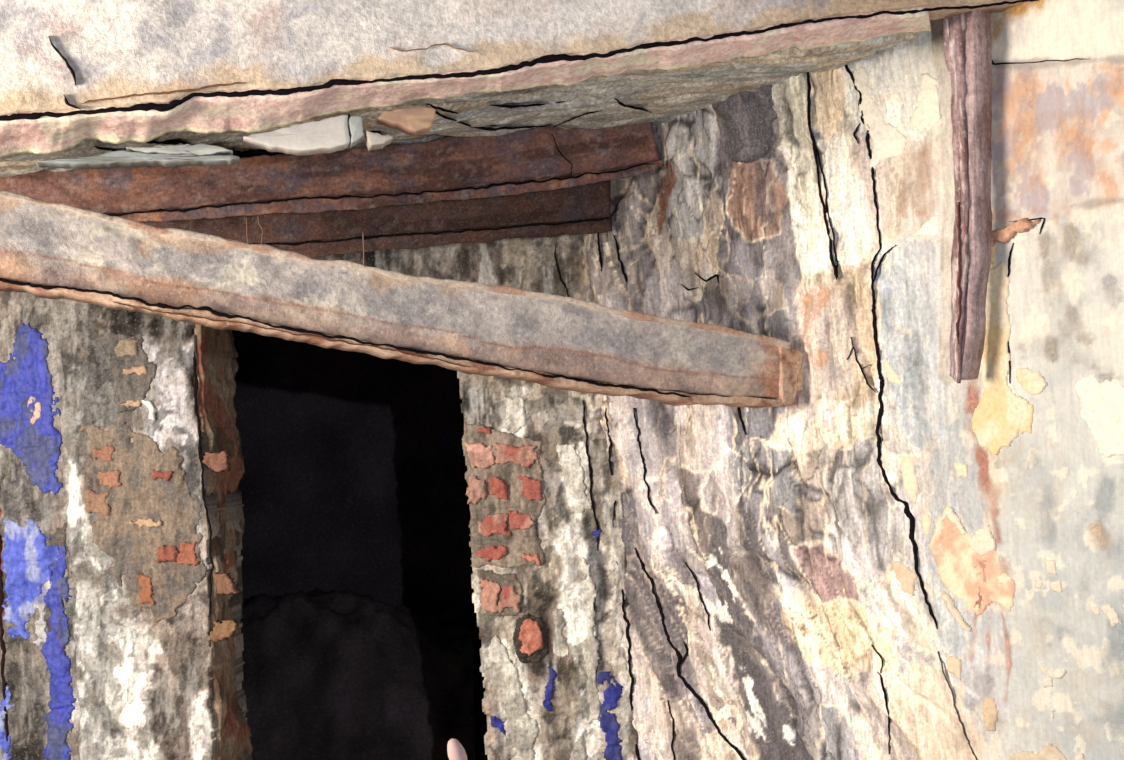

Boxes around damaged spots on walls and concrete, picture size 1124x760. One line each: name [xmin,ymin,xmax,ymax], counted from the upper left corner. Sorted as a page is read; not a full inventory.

crack [0,0,1039,216]
crack [806,72,838,279]
crack [992,57,1084,65]
peeling [0,322,63,495]
peeling [0,519,76,760]
crack [0,278,746,760]
flaking render [883,358,902,385]
flaking render [893,561,918,596]
crack [845,65,977,760]
spalling [900,456,1016,631]
flaking render [971,244,1047,455]
flaking render [1074,373,1124,458]